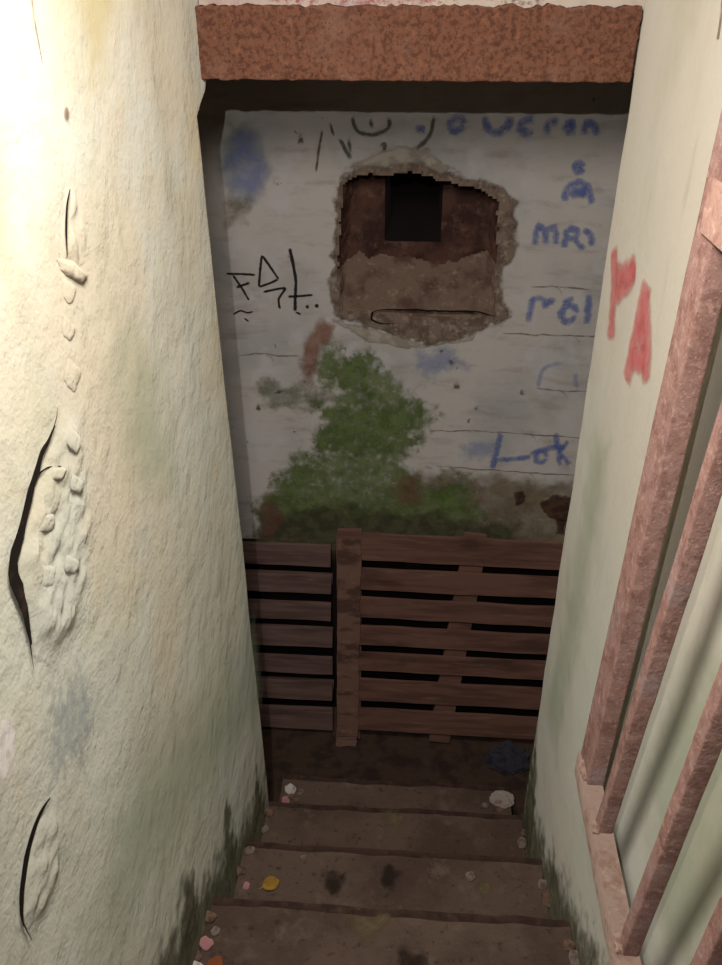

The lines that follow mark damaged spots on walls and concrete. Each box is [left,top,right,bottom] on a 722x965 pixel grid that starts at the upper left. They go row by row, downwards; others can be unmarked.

crack [63,190,71,257]
spalling [328,146,518,348]
crack [8,409,60,668]
crack [19,798,50,940]